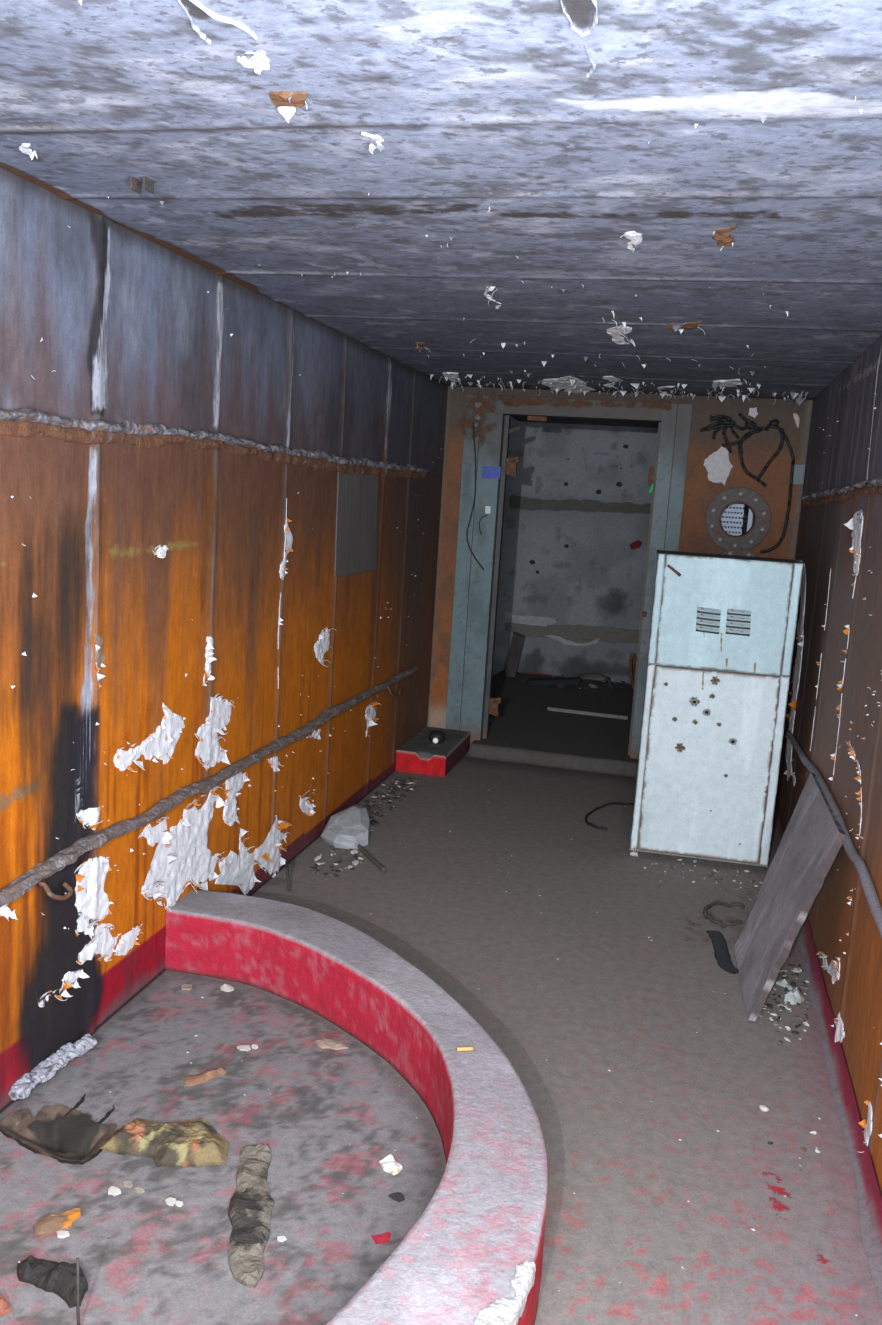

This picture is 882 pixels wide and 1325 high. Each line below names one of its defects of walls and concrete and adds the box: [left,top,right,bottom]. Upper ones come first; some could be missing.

water stain [92,229,110,410]
peeling [430,311,809,418]
corrosion [0,407,429,540]
spalling [704,446,733,486]
corrosion [801,476,882,508]
water stain [81,451,97,755]
peeling [302,627,336,676]
peeling [76,806,110,830]
peeling [103,636,294,911]
peeling [0,904,18,921]
peeling [38,856,143,1007]
spalling [474,1260,536,1325]